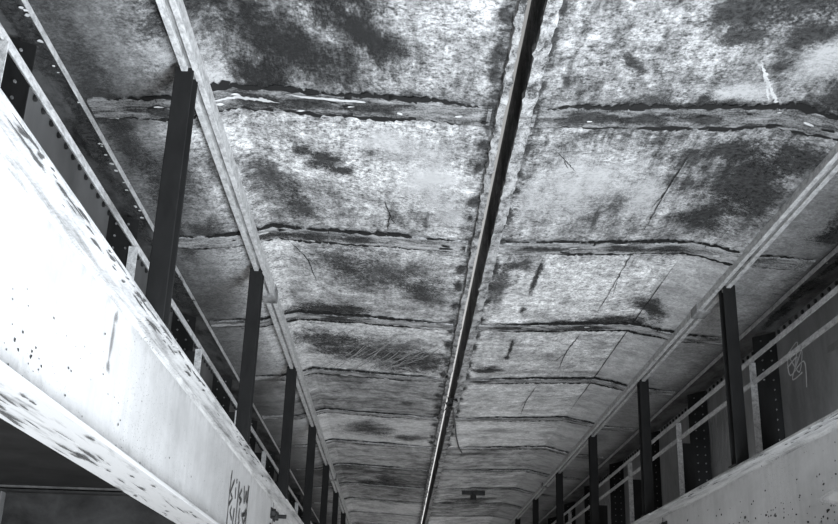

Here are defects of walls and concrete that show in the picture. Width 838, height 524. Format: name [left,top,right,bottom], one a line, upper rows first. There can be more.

leakage [128,0,177,63]
leakage [183,0,239,54]
leakage [308,0,409,69]
leakage [698,0,838,75]
spalling [105,96,171,122]
leakage [209,50,359,103]
spalling [210,80,488,122]
leakage [613,77,770,108]
leakage [786,88,838,115]
crack [643,148,695,231]
crack [574,261,678,405]